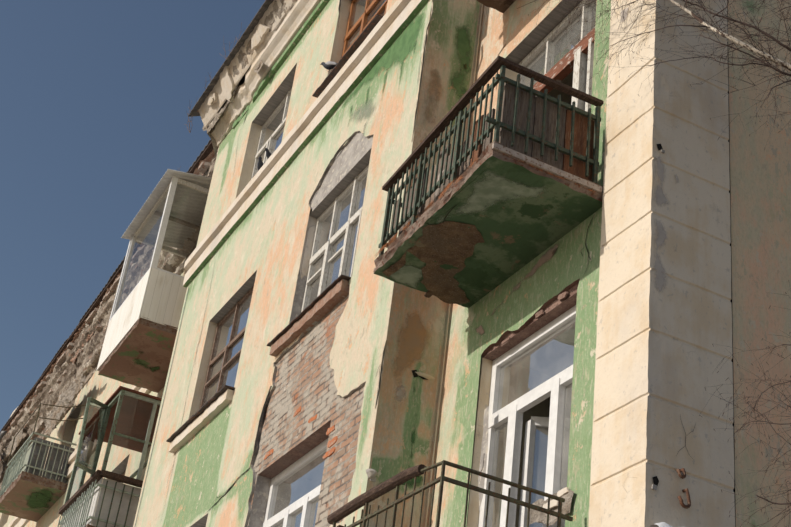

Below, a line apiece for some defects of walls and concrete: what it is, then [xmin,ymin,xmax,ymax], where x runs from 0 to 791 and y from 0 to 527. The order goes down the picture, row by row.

flaking render [202,0,296,133]
water stain [344,14,423,129]
spalling [382,172,543,304]
spalling [1,428,28,462]
spalling [44,371,93,436]
crack [205,386,271,514]
peeling [322,425,338,459]